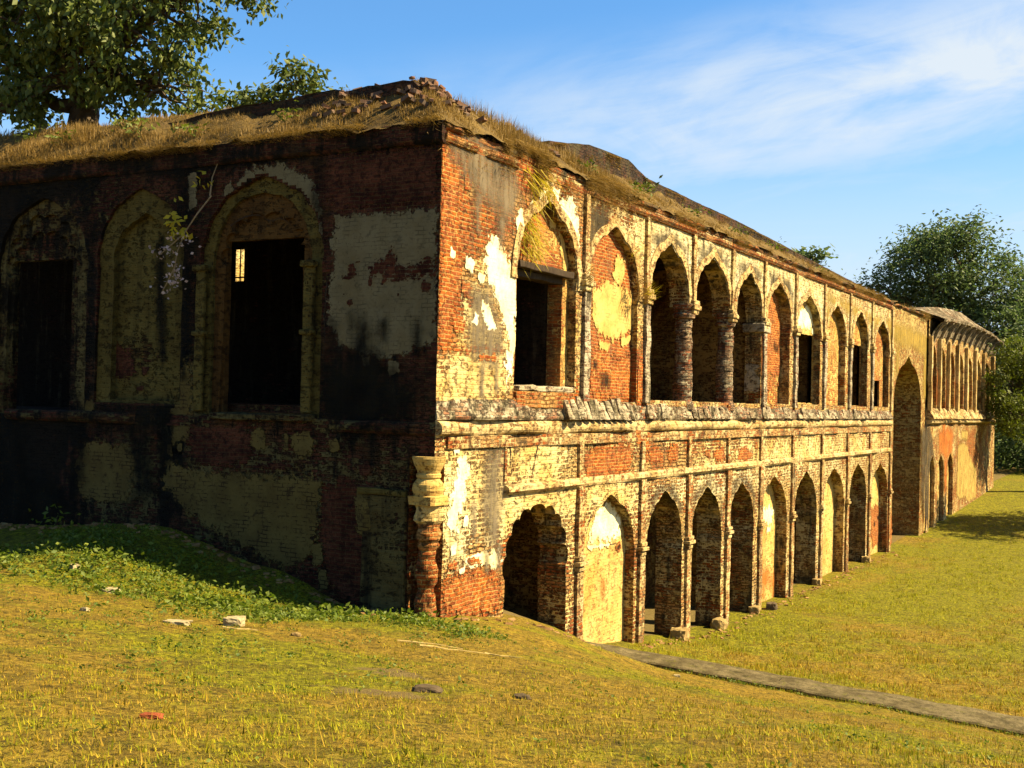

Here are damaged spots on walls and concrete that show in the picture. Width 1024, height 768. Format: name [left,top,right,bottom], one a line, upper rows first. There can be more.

flaking render [187,172,198,212]
flaking render [222,143,516,387]
flaking render [589,254,647,413]
flaking render [160,428,328,591]
flaking render [439,556,503,617]
flaking render [705,442,758,463]